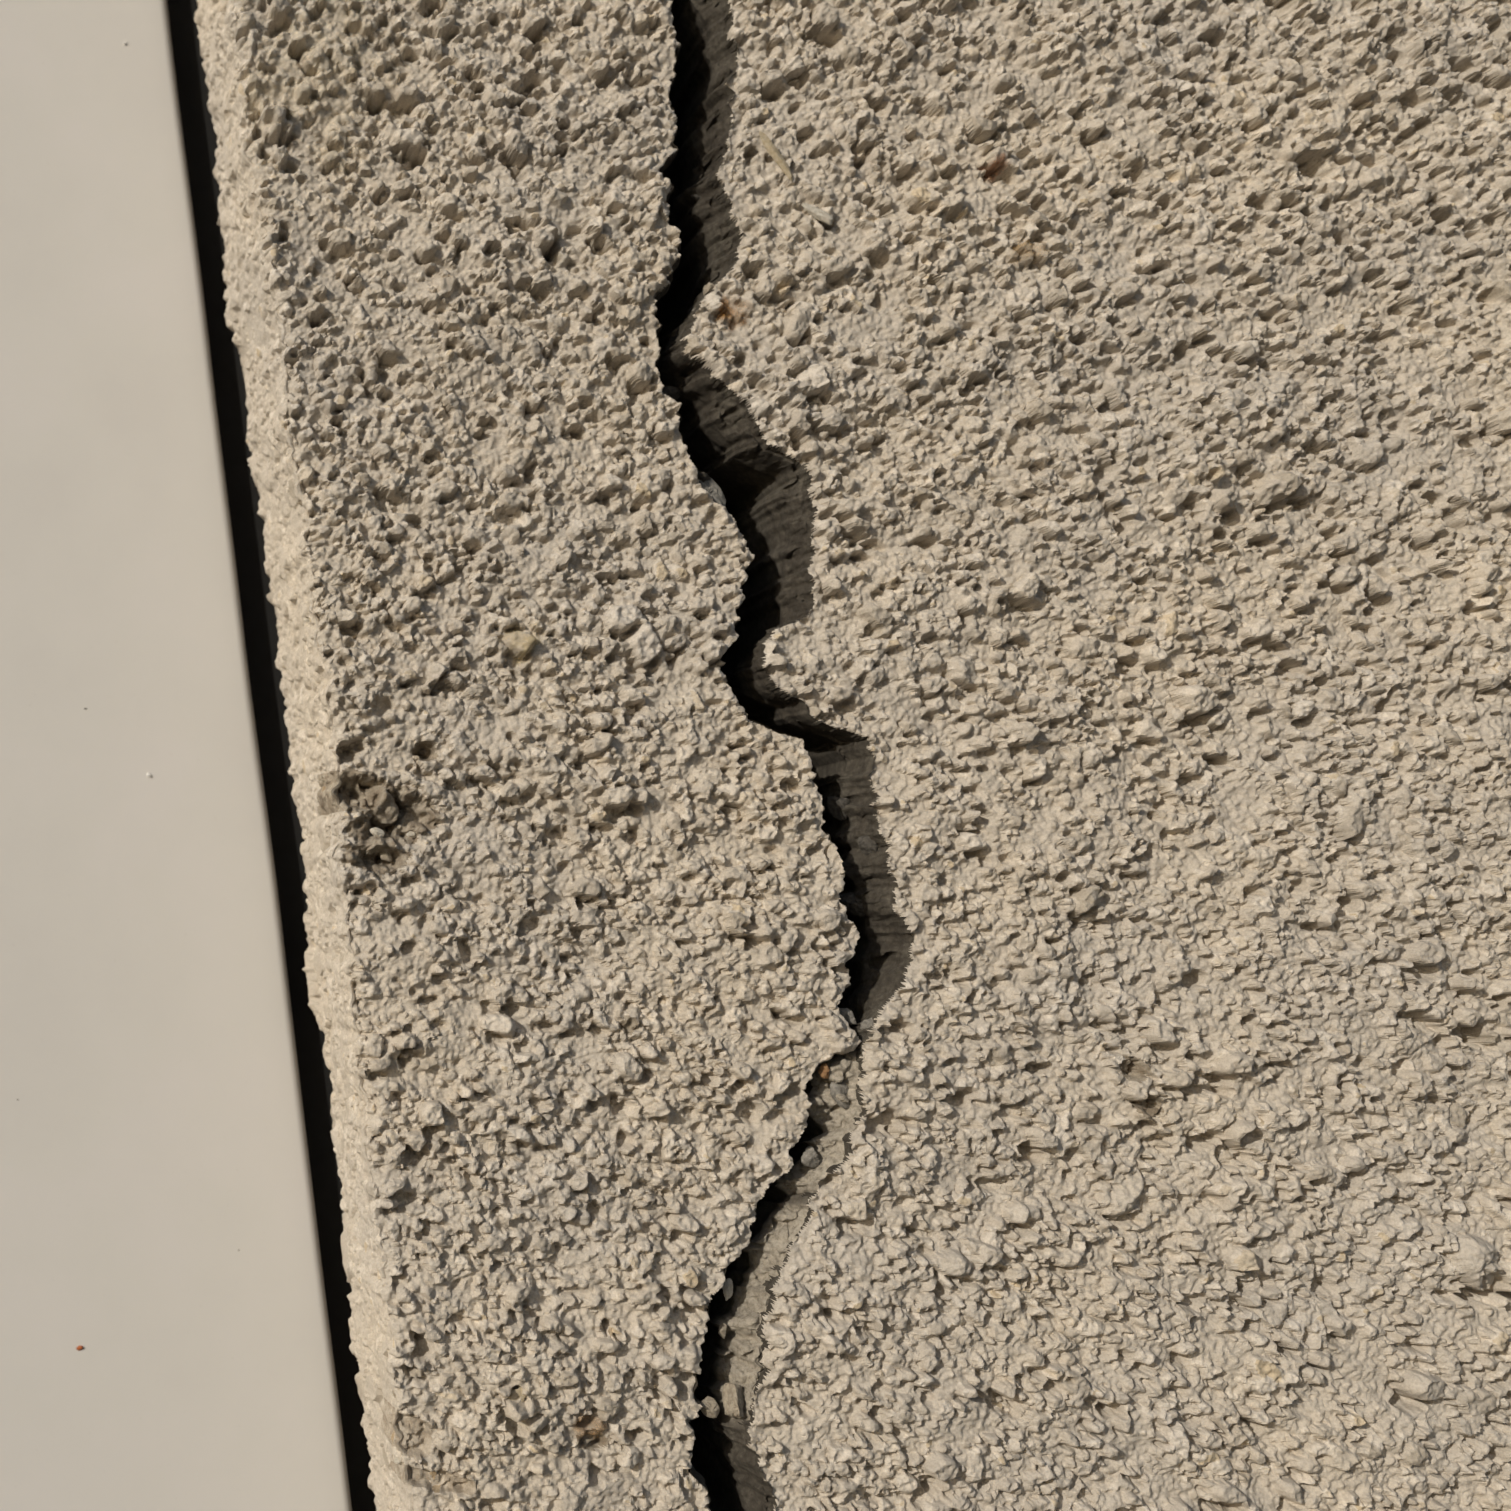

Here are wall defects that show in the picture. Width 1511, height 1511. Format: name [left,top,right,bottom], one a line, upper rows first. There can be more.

crack [654,0,914,1511]